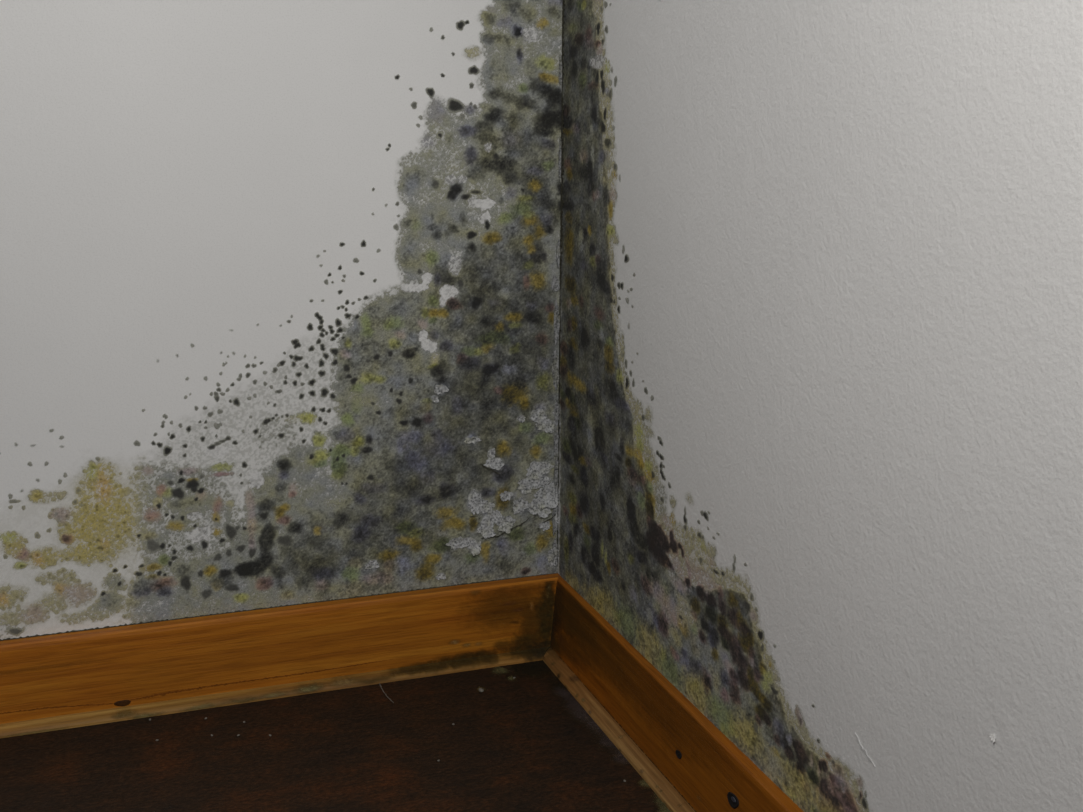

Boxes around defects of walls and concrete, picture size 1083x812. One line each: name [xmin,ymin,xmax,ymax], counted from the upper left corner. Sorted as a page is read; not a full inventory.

damp [0,0,620,636]
damp [400,651,503,674]
damp [506,581,589,673]
damp [558,189,869,812]